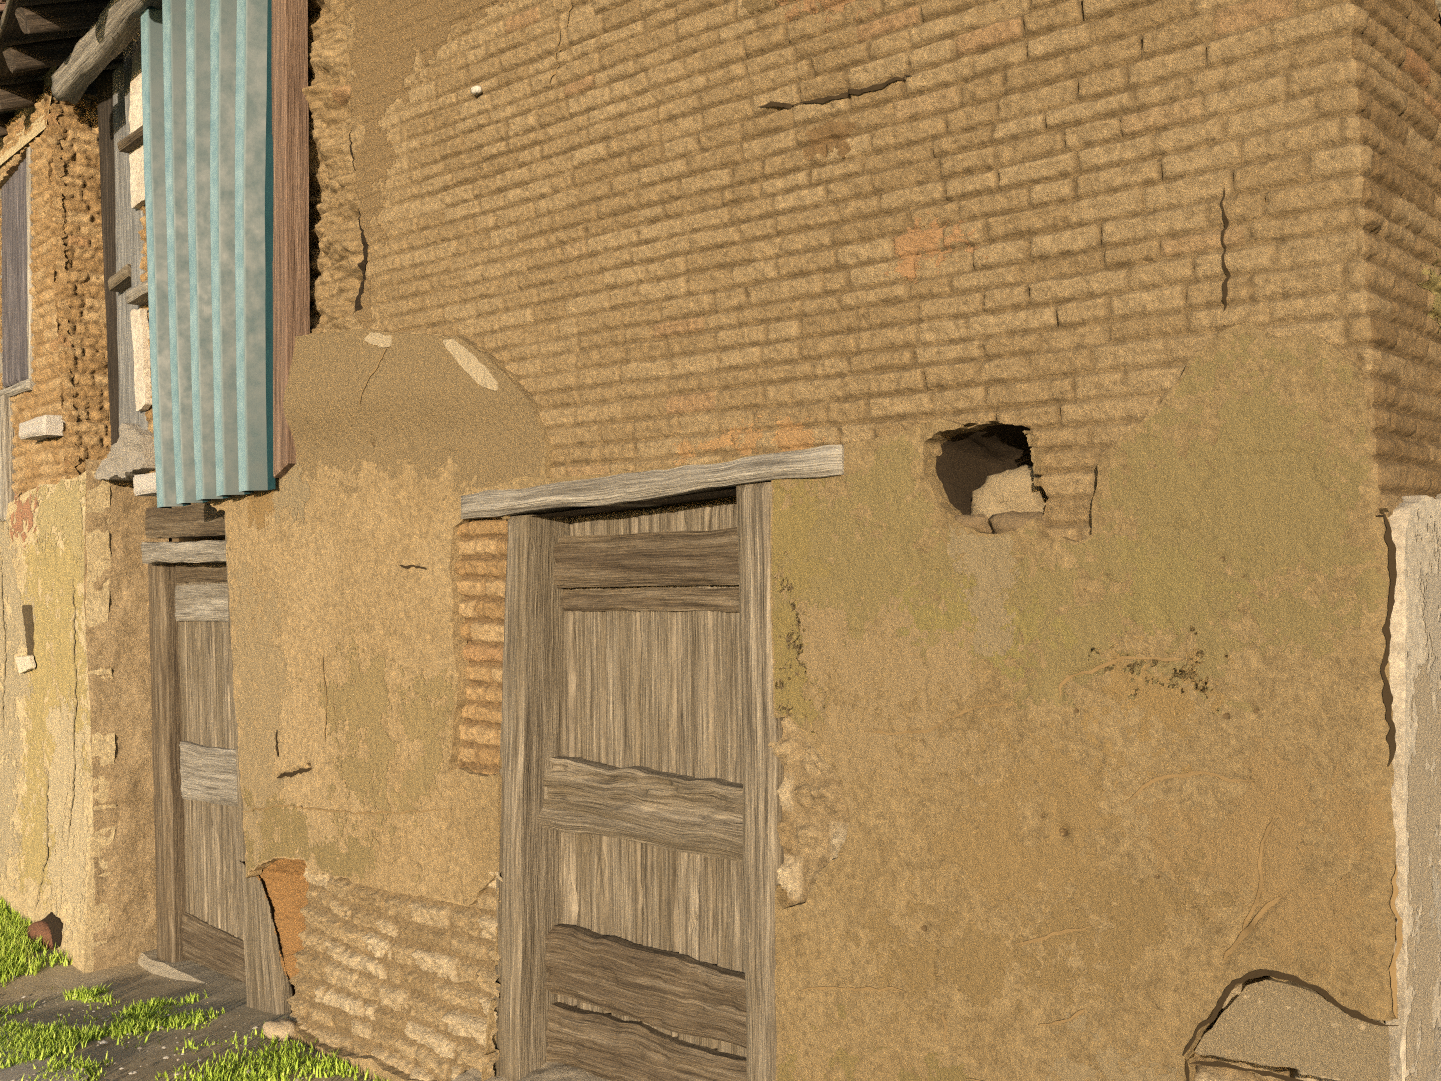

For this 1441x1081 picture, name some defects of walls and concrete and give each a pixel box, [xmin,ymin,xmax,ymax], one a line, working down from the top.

peeling [345,0,514,348]
crack [1220,186,1231,310]
spalling [443,339,498,391]
flaking render [455,515,520,775]
leakage [773,523,1033,838]
crack [1058,656,1185,699]
flaking render [768,716,850,907]
flaking render [256,858,503,1081]
spalling [1194,976,1390,1081]